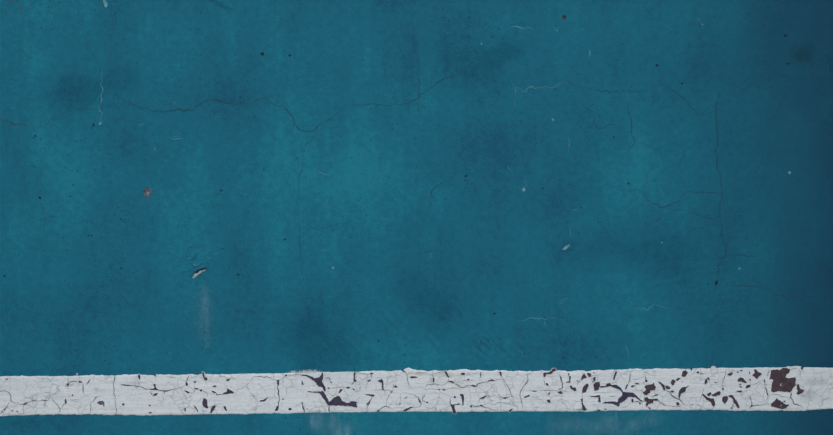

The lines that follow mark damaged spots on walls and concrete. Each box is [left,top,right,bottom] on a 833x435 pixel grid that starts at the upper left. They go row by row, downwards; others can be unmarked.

crack [0,9,459,302]
crack [511,80,760,363]
peeling [121,371,250,414]
peeling [295,372,398,413]
peeling [533,368,804,411]